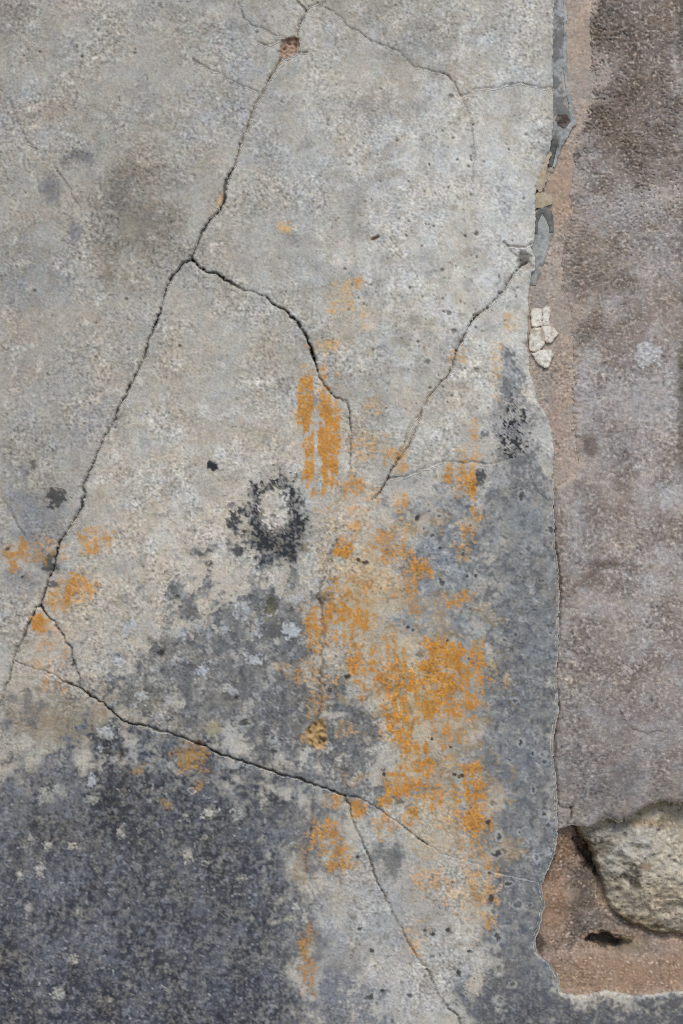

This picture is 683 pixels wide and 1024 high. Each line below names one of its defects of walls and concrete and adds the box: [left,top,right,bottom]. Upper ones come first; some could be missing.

crack [238,0,553,191]
crack [0,51,538,1024]
crack [554,523,563,641]
water stain [0,458,408,1024]
crack [554,689,574,819]
spalling [535,825,683,995]